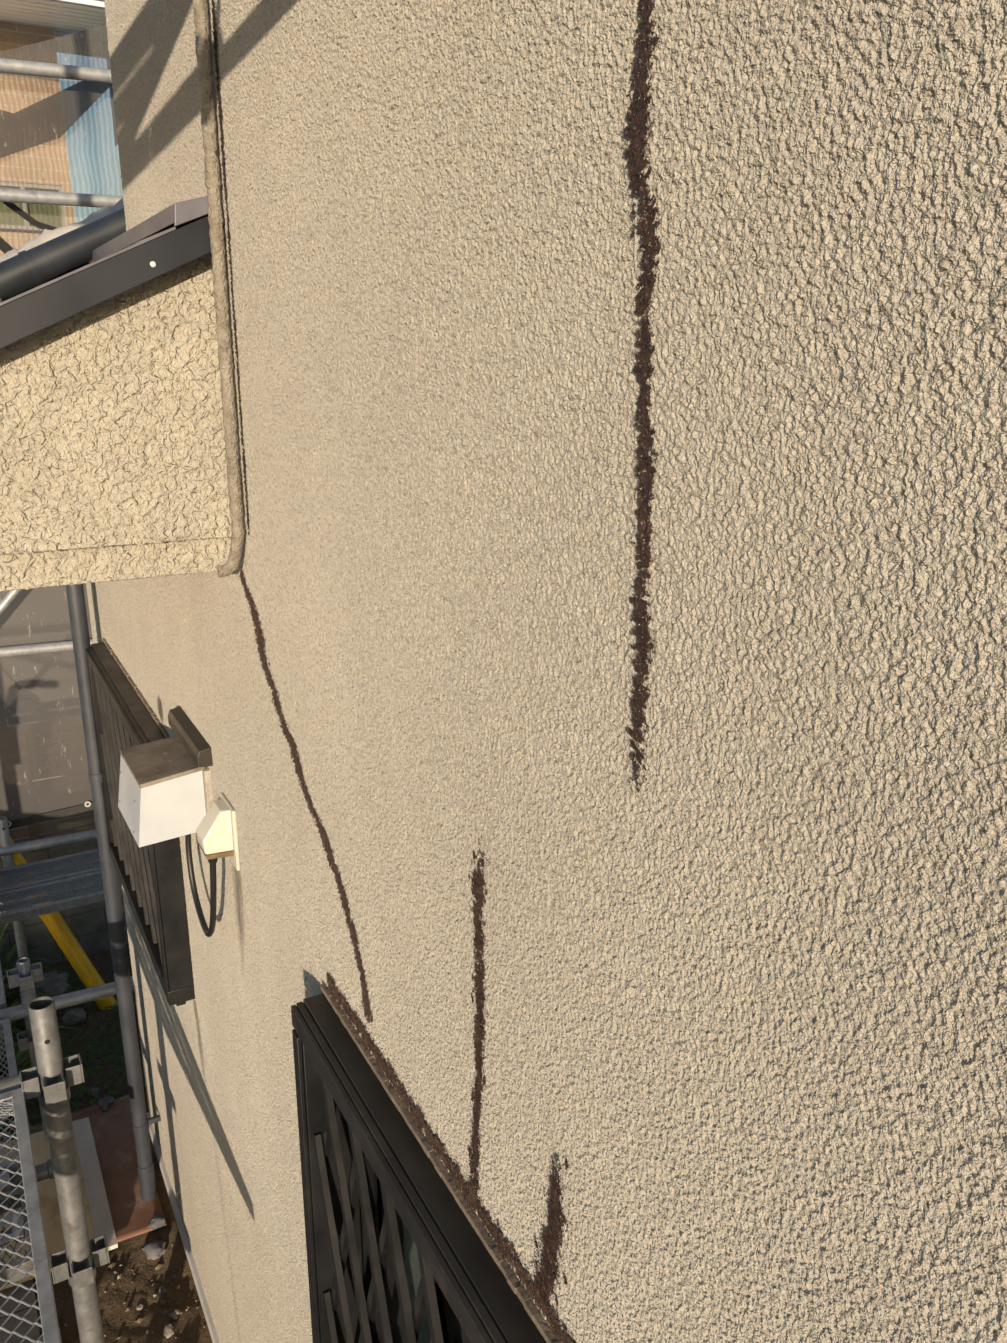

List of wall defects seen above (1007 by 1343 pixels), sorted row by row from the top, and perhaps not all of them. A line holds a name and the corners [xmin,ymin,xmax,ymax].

crack [621,0,661,820]
crack [239,570,373,1028]
crack [468,836,490,1196]
crack [532,1135,569,1306]